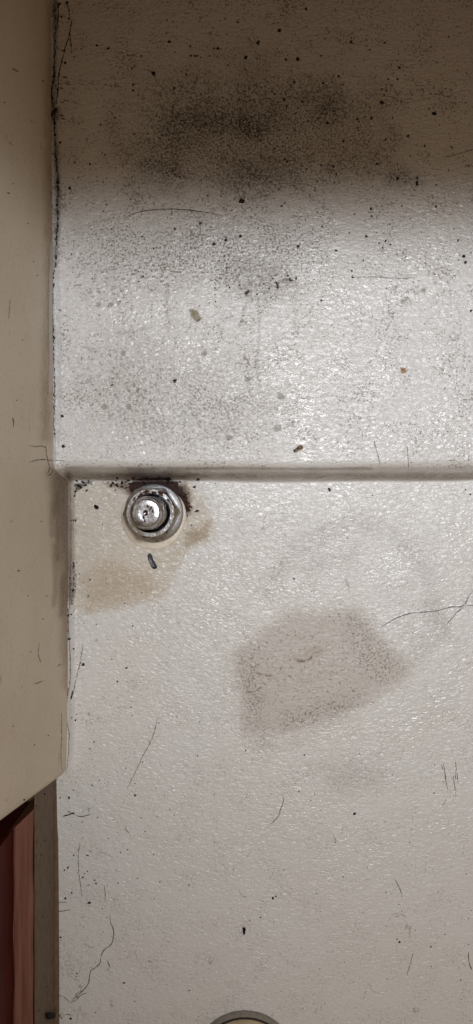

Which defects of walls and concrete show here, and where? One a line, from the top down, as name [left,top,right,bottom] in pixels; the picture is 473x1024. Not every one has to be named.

damp [115,4,413,228]
rust [107,476,200,526]